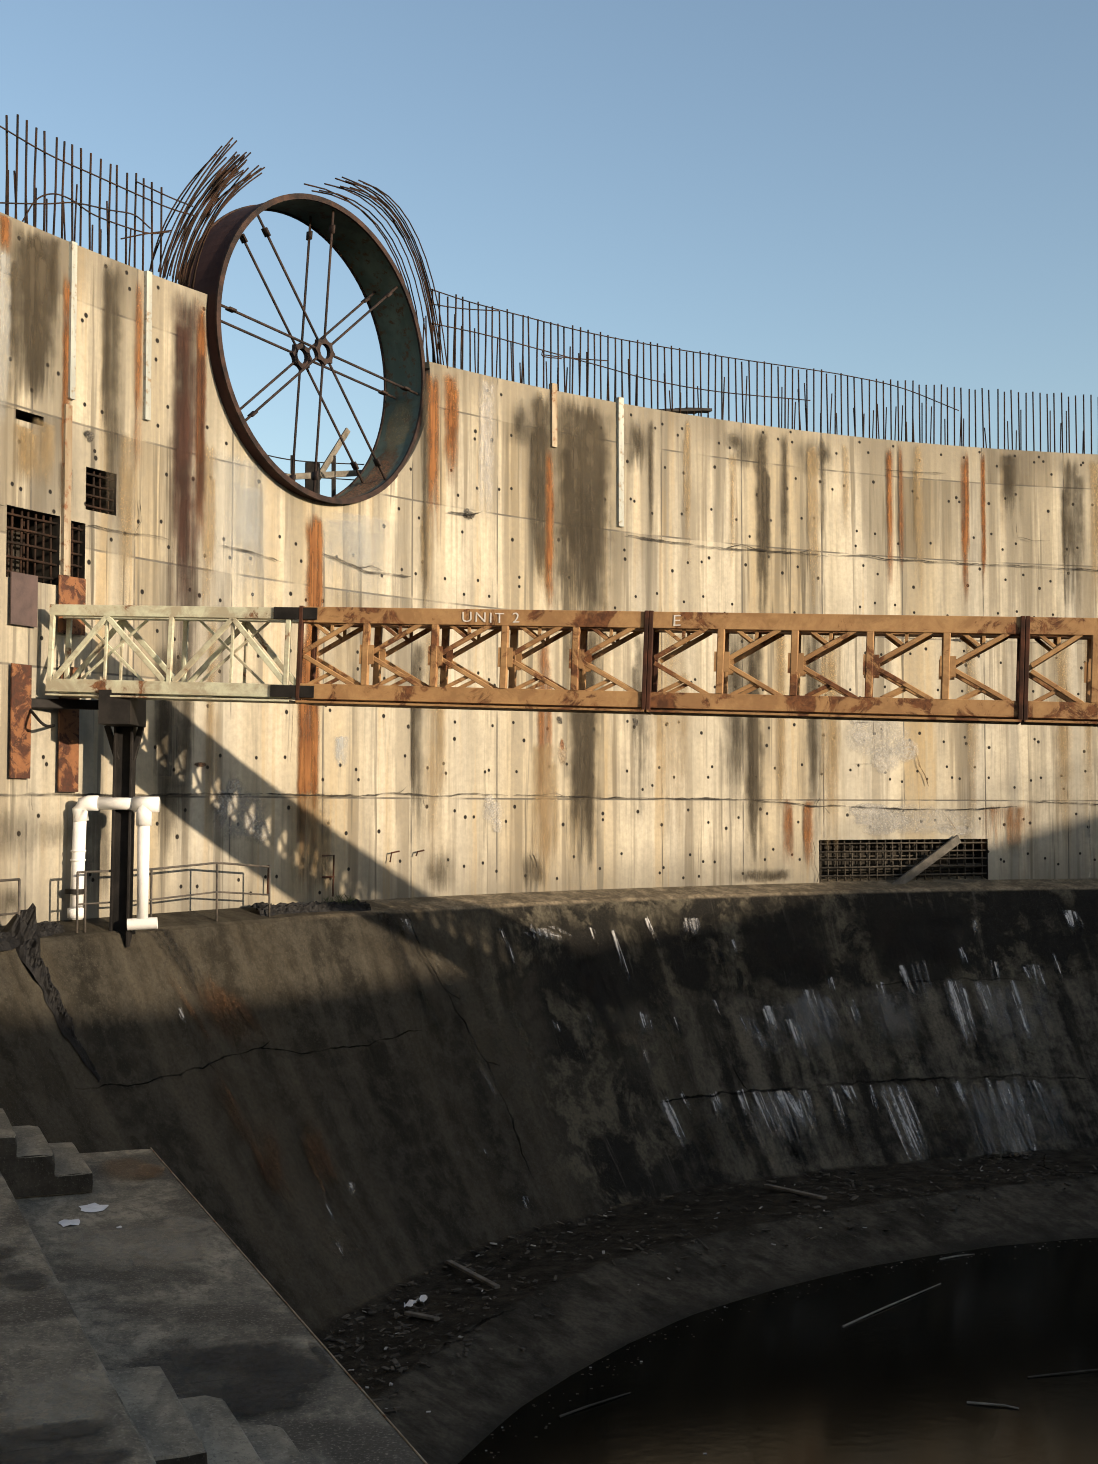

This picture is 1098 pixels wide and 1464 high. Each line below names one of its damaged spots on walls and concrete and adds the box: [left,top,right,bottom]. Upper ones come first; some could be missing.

leakage [0,233,58,389]
rust [196,311,206,520]
rust [427,376,458,503]
leakage [737,433,788,603]
rust [962,457,986,589]
leakage [1062,462,1098,586]
rust [298,517,323,865]
leakage [573,713,597,834]
leakage [733,717,782,847]
crack [100,1030,419,1087]
crack [665,1069,803,1102]
crack [847,1074,1021,1085]